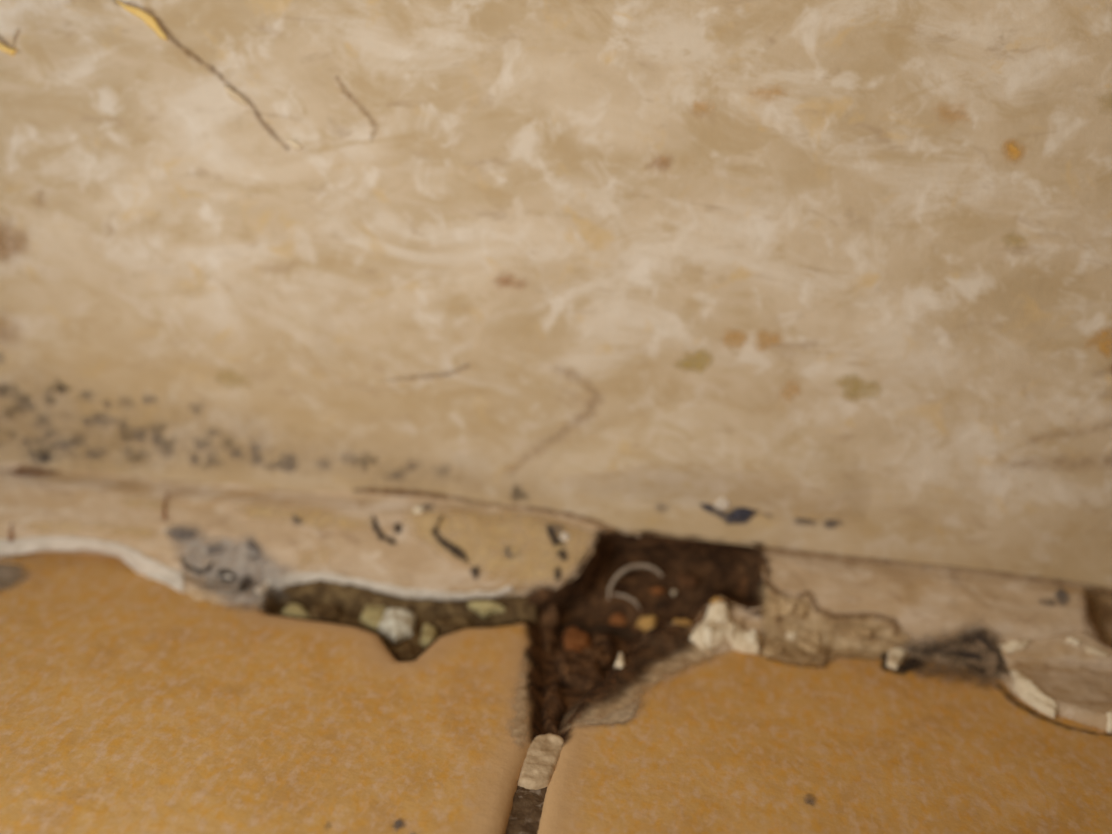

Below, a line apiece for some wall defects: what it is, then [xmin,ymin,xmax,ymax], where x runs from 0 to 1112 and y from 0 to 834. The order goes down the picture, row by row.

crack [116,0,179,45]
crack [211,68,304,150]
spalling [411,512,909,743]
spalling [1086,593,1112,648]